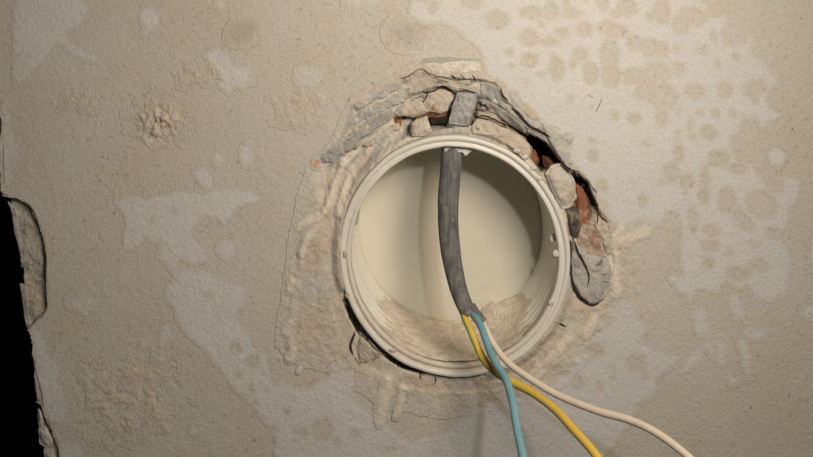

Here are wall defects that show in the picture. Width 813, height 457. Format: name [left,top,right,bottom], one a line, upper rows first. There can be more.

spalling [3,195,48,333]
spalling [274,58,646,419]
spalling [37,402,60,457]